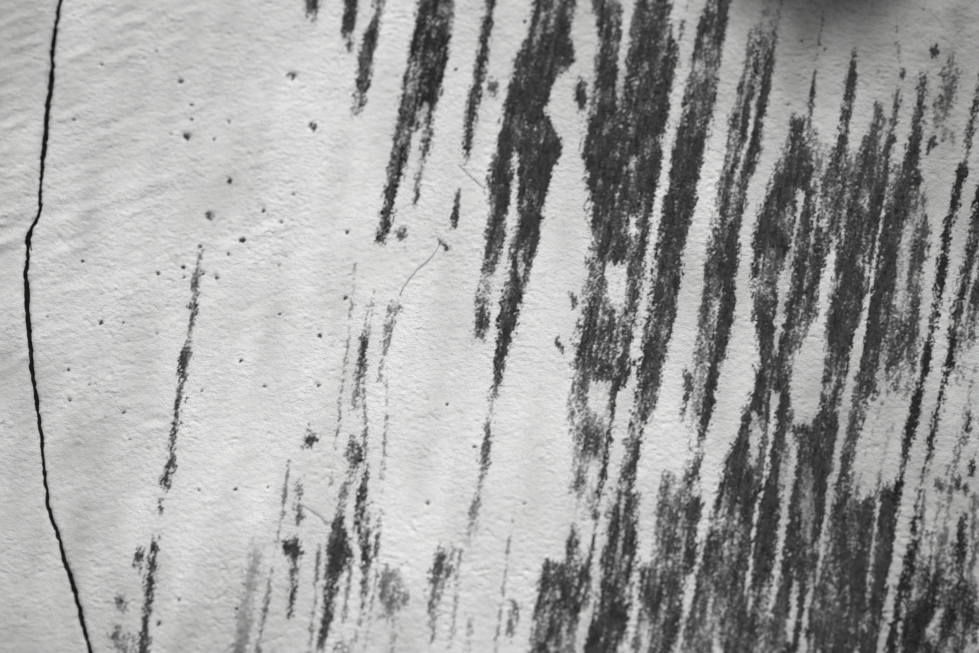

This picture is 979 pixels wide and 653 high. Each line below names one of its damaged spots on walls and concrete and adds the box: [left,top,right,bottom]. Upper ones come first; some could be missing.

crack [23,0,93,653]